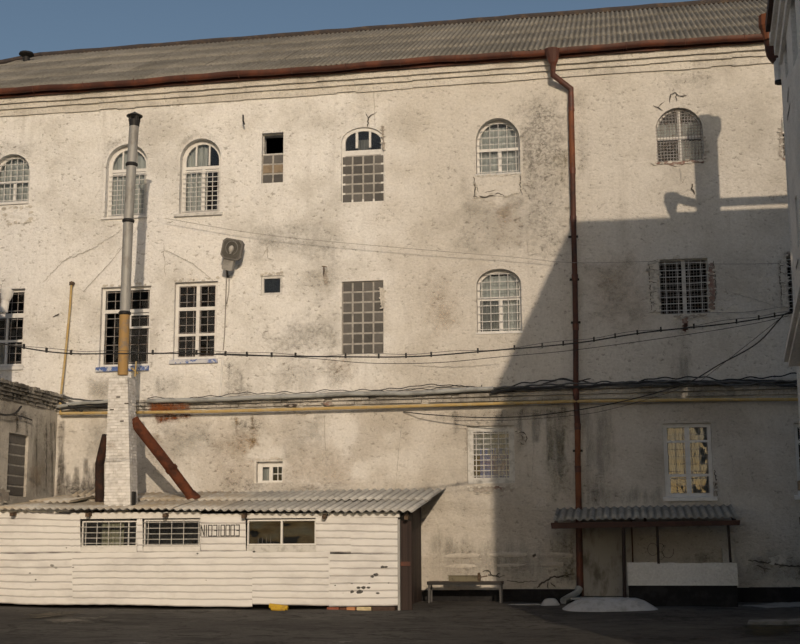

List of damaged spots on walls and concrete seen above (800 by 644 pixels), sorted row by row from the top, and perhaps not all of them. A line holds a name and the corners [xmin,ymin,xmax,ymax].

peeling [473,173,522,198]
spalling [645,254,717,333]
corrosion [150,403,190,423]
leakage [59,462,95,494]